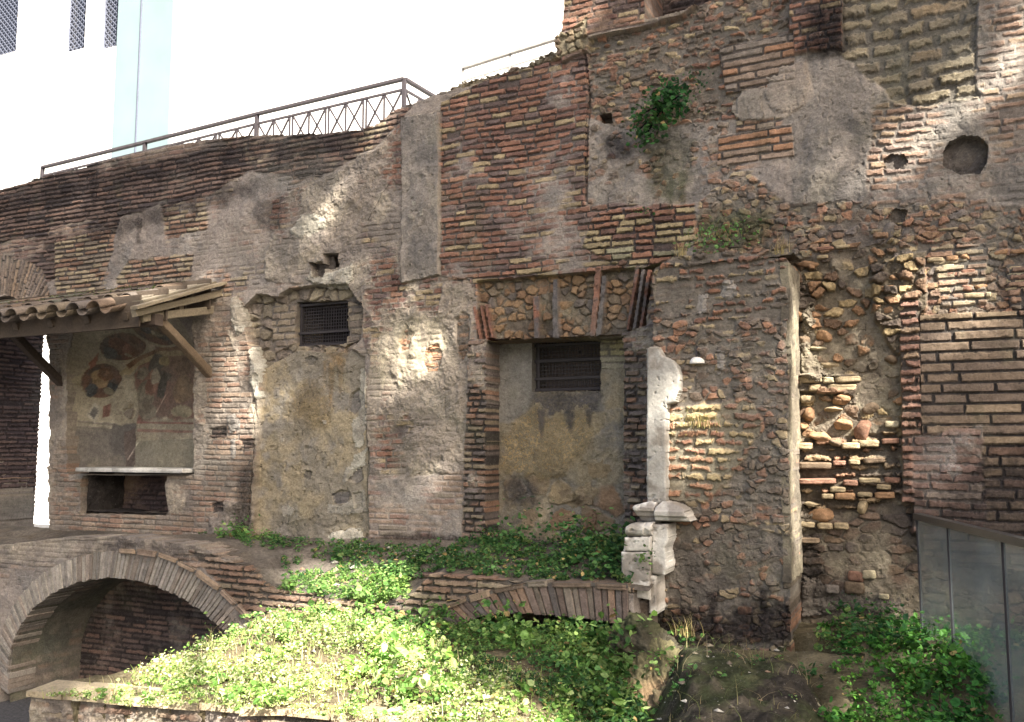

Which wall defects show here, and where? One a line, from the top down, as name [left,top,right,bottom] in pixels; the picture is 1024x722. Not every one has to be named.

damp [534,391,600,433]